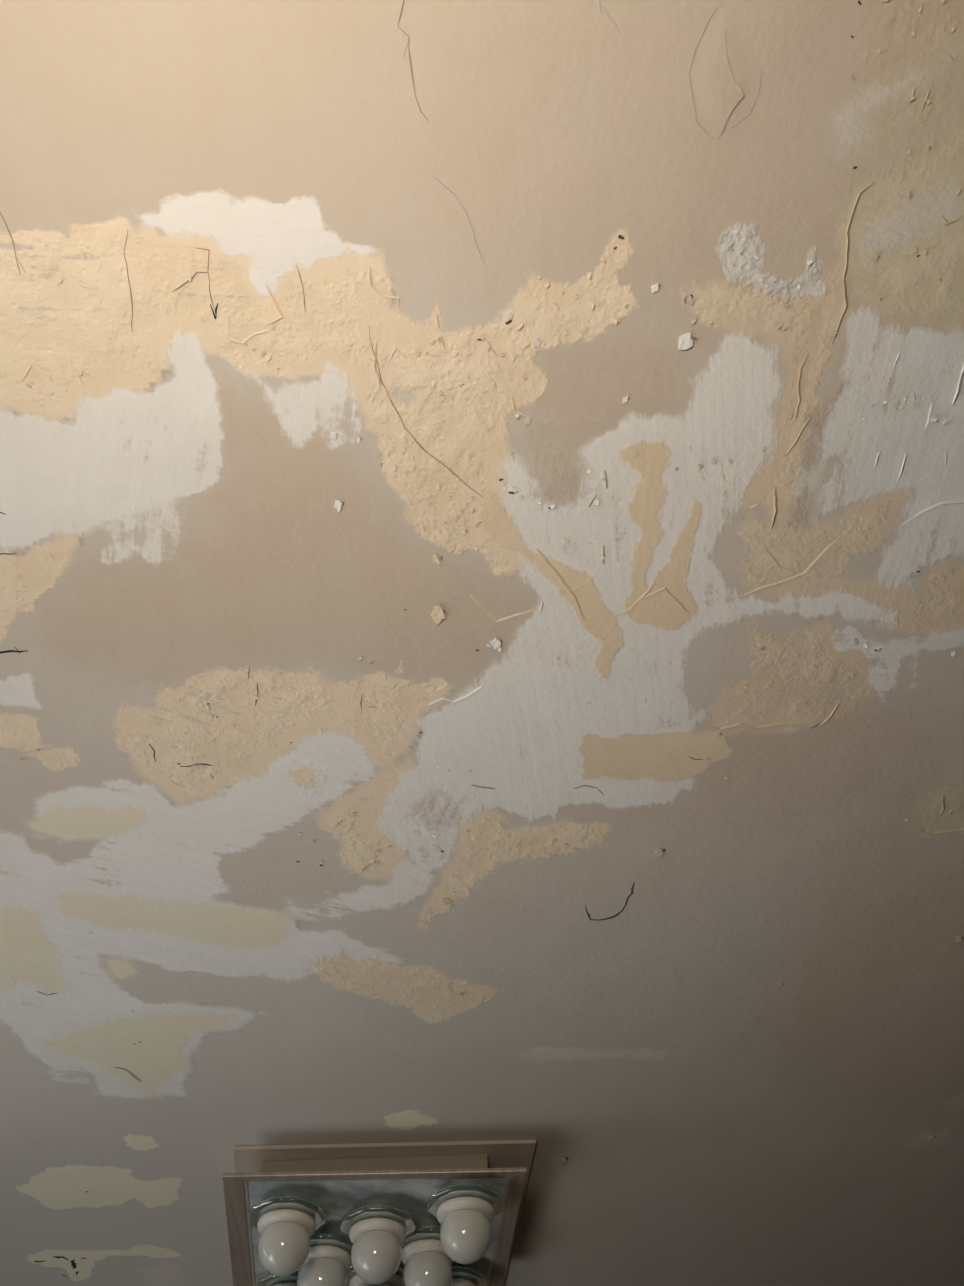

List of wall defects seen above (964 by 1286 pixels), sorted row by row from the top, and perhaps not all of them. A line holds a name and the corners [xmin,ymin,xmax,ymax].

crack [398,0,429,121]
crack [0,212,26,275]
crack [434,177,485,264]
peeling [0,206,862,686]
peeling [0,651,485,796]
peeling [572,703,840,788]
crack [585,882,635,921]
peeling [0,900,255,1102]
peeling [306,947,518,1031]
peeling [7,1127,192,1214]
peeling [18,1240,198,1286]